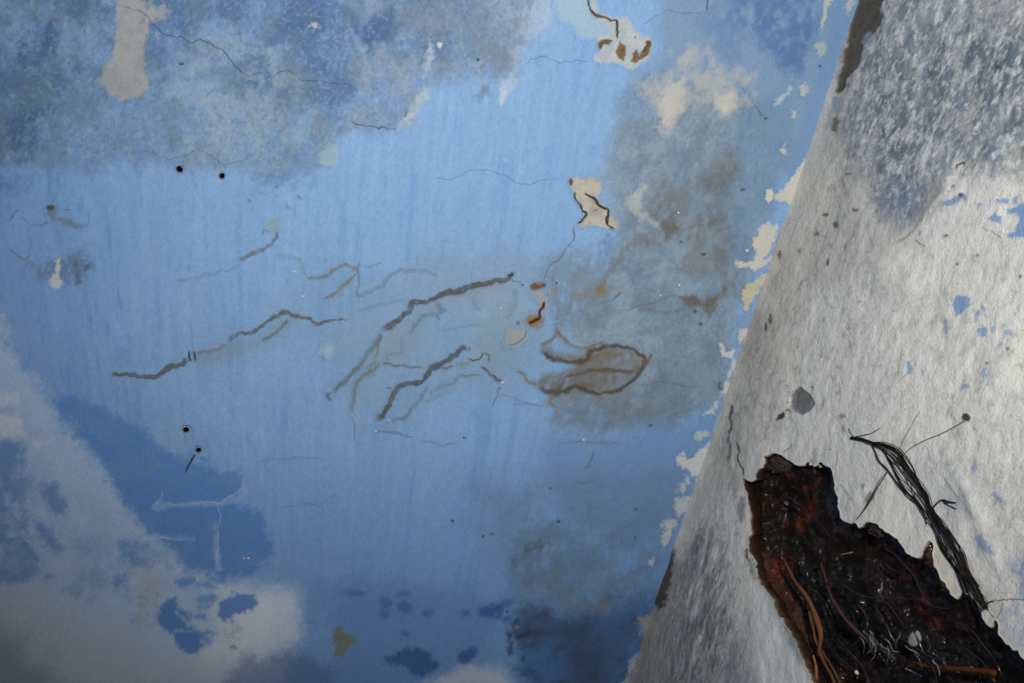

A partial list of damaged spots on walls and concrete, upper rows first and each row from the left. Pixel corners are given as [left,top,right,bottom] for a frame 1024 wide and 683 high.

flaking render [94,0,175,106]
flaking render [552,0,766,140]
spalling [567,175,665,232]
peeling [764,141,805,206]
rust [502,279,551,350]
peeling [733,220,782,313]
damp [0,140,756,683]
spalling [741,451,1024,683]